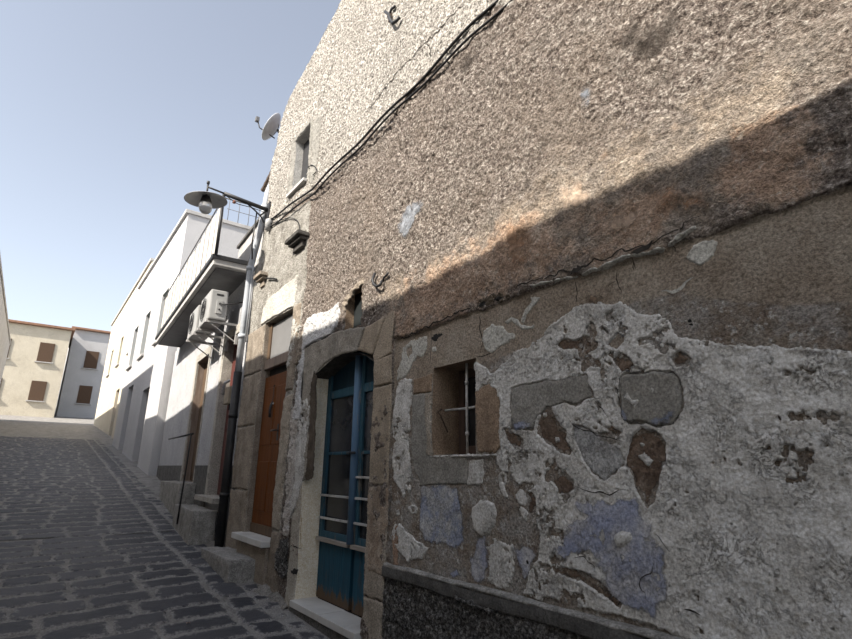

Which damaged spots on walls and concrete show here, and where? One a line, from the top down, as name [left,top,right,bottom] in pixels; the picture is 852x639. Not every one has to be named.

crack [401,307,491,364]
spalling [475,293,510,308]
peeling [482,226,696,353]
crack [510,216,699,301]
peeling [686,240,718,266]
peeling [282,302,341,538]
peeling [367,301,852,639]